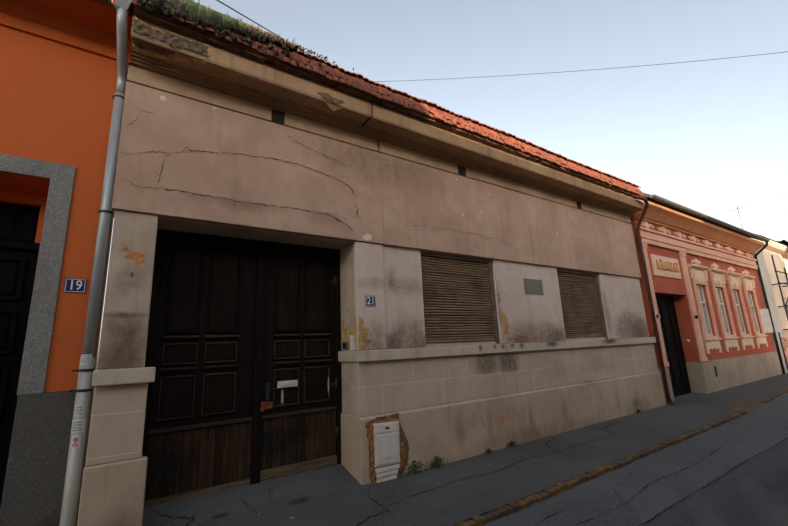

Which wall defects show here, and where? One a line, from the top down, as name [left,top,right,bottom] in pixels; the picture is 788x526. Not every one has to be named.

crack [118,135,361,232]
peeling [121,245,145,277]
peeling [341,309,372,350]
flaking render [366,413,409,484]